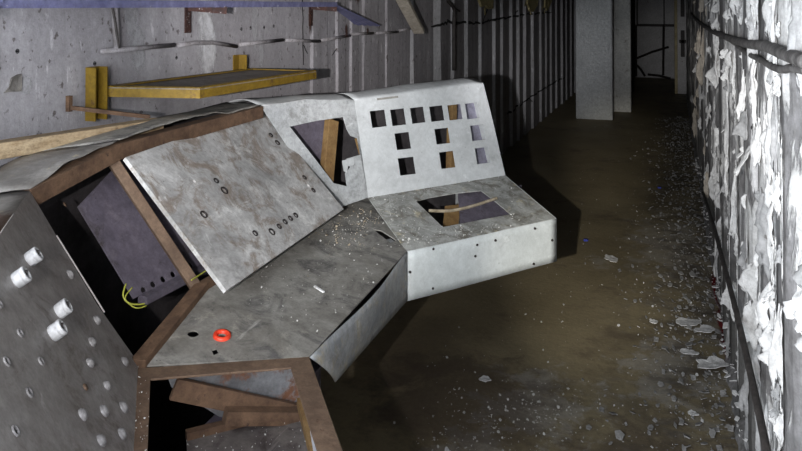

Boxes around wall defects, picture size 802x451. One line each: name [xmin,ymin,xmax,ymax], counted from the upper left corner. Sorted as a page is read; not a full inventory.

peeling [689,0,802,451]